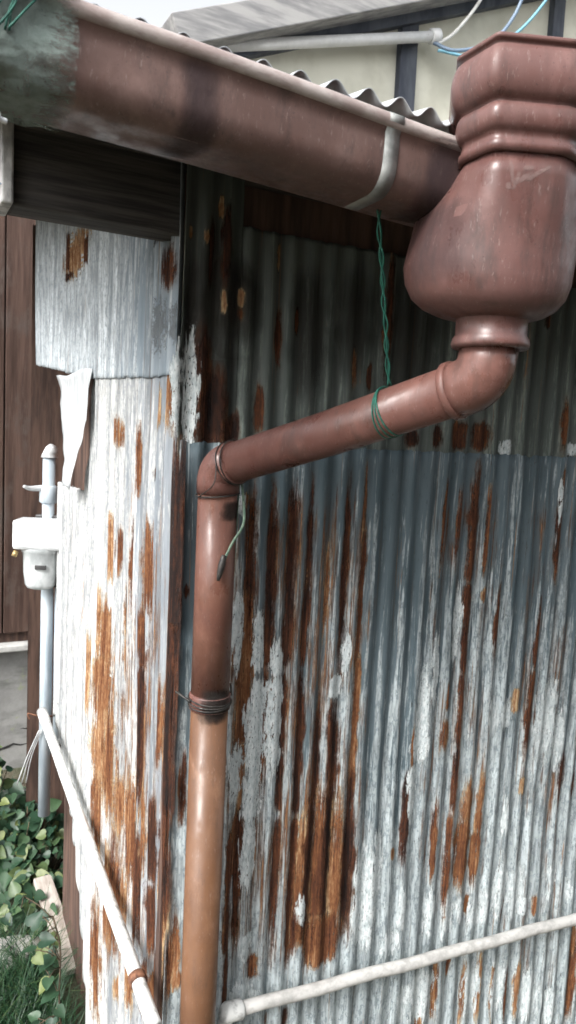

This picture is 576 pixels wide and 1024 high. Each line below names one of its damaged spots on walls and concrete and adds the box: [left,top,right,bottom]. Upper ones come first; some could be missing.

rust [63,228,92,281]
rust [161,242,177,290]
peeling [151,295,202,444]
rust [221,288,245,320]
rust [84,327,240,1024]
rust [221,464,375,1003]
rust [391,420,502,923]
rust [510,470,575,865]